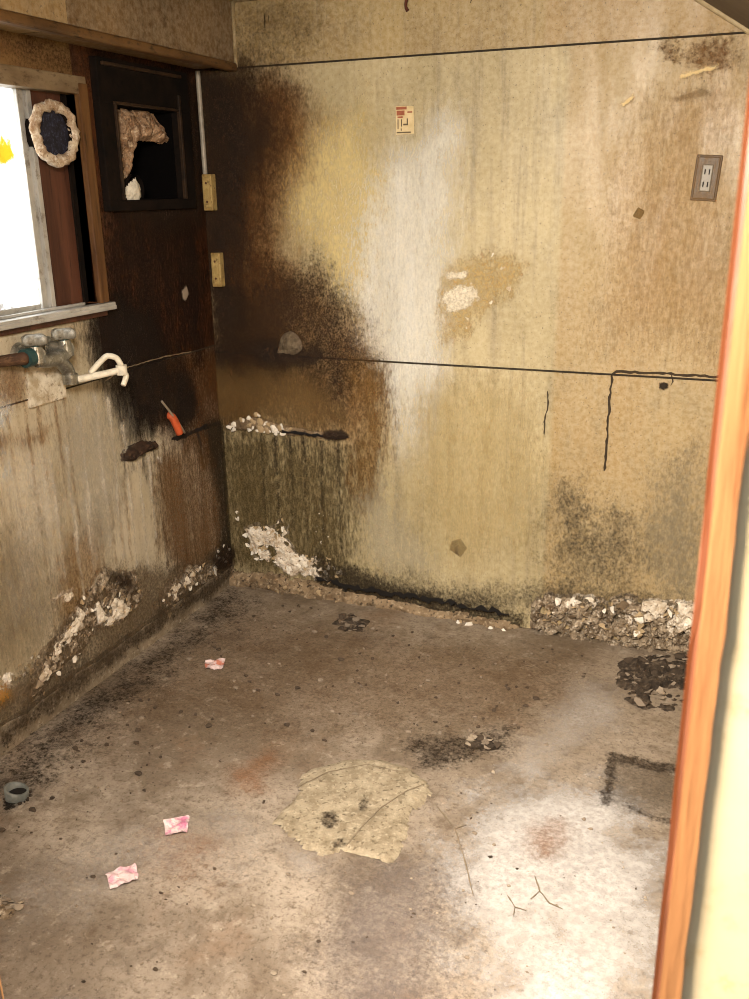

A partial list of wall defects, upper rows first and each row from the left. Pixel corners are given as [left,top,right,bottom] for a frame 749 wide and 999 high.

damp [276,112,457,419]
peeling [438,252,523,341]
damp [0,590,243,795]
damp [0,361,655,728]
spalling [530,591,694,654]
spalling [323,812,337,828]
damp [319,752,676,999]